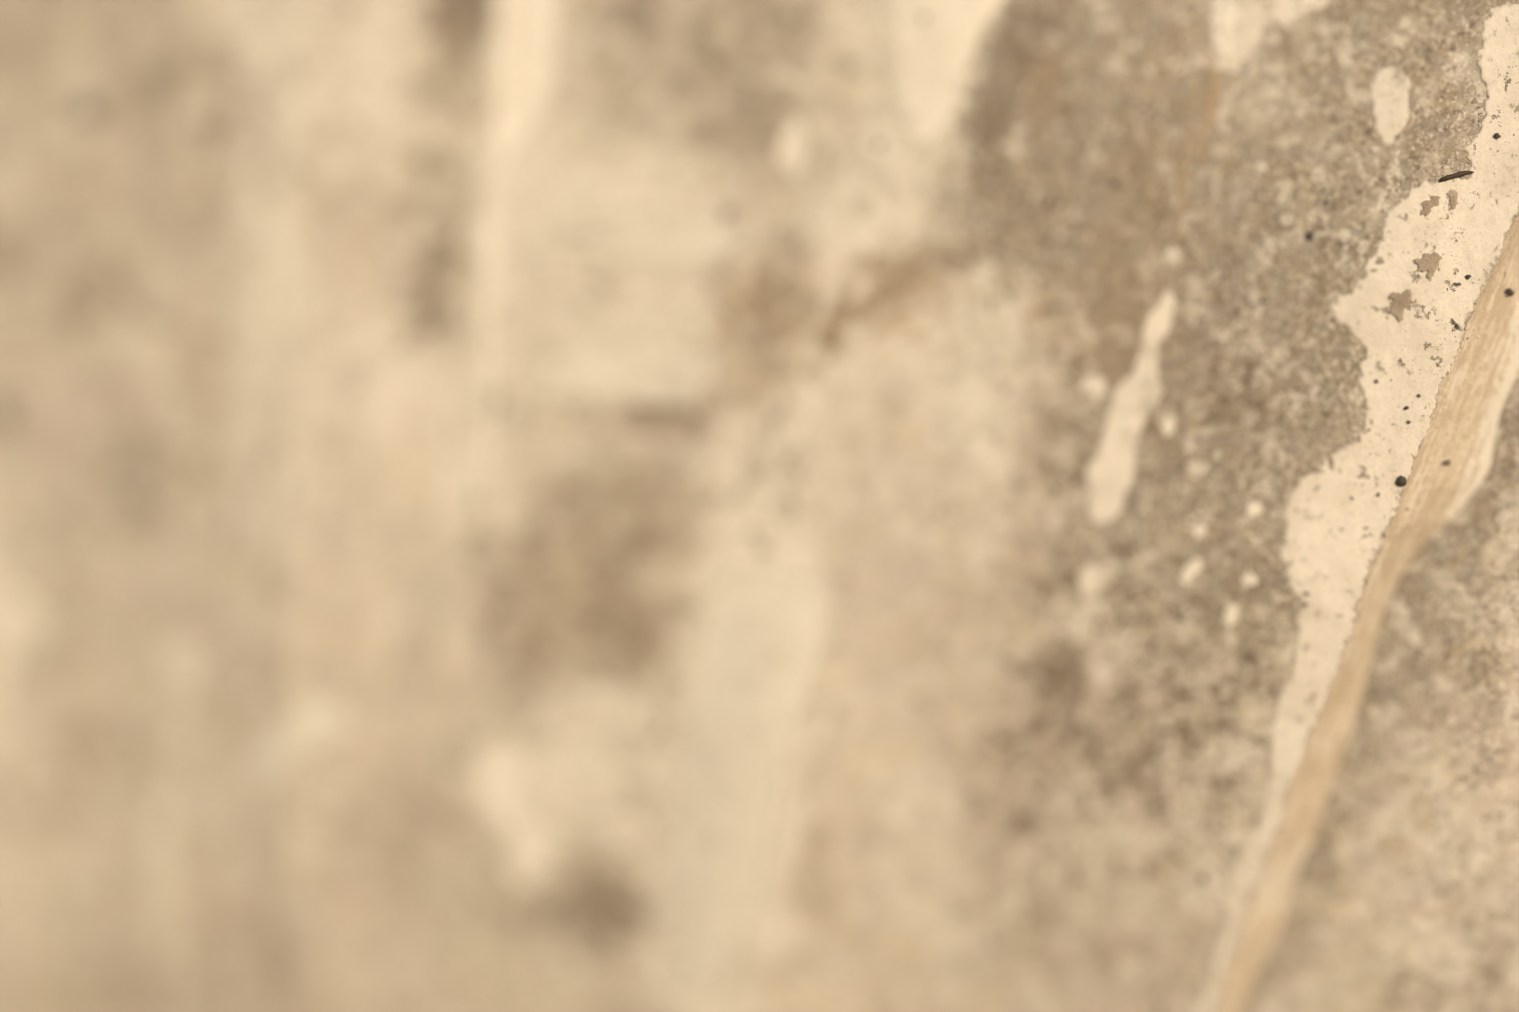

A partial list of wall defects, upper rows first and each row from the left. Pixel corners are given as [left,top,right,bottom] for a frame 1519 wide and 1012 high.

peeling [1186,460,1209,478]
peeling [1192,0,1519,1012]
peeling [1178,558,1203,586]